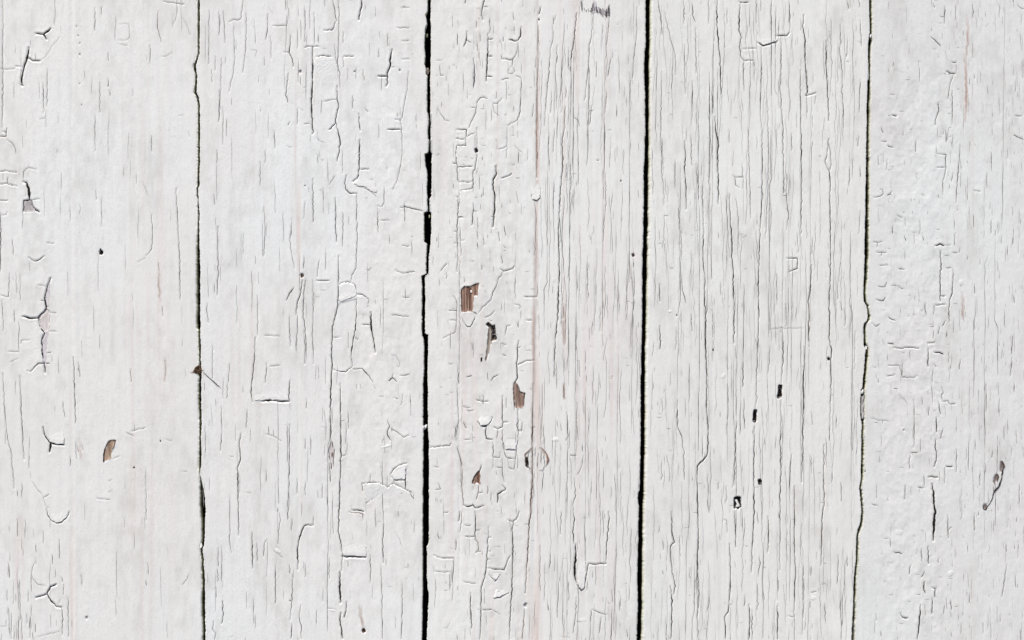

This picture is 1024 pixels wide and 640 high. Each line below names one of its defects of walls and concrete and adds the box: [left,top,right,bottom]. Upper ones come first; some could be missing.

crack [125,188,183,347]
crack [0,6,83,640]
crack [145,0,422,640]
peeling [460,283,479,326]
peeling [480,322,497,361]
crack [420,0,1024,640]
peeling [513,382,525,408]
peeling [103,439,116,462]
spalling [983,461,1005,510]